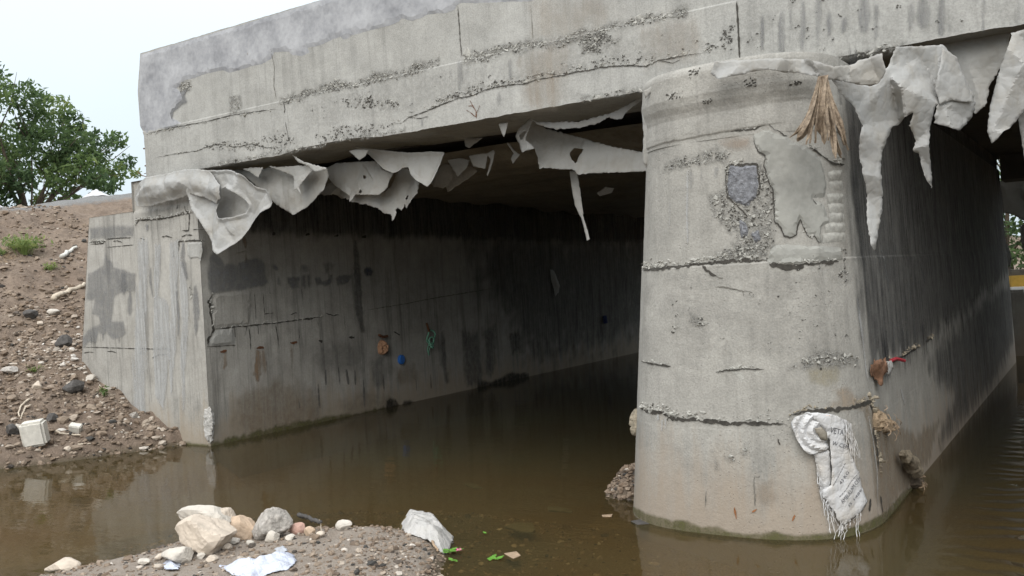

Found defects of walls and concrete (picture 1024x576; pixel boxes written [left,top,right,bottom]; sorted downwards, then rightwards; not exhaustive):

crack [147,50,289,157]
crack [393,46,712,124]
crack [642,125,845,296]
peeling [187,242,202,261]
water stain [208,254,277,293]
water stain [847,100,1013,438]
crack [84,288,346,358]
crack [638,395,873,445]